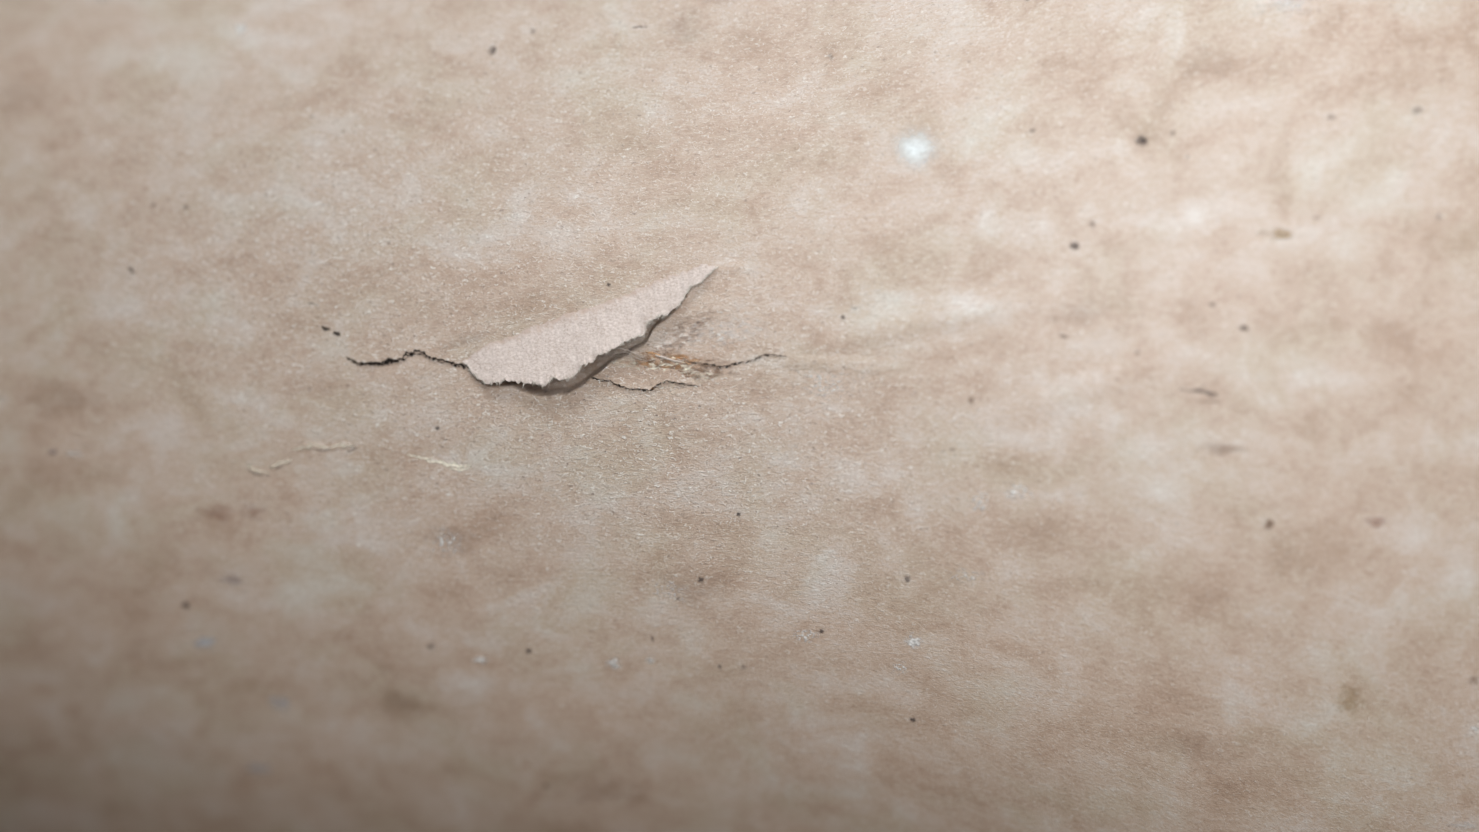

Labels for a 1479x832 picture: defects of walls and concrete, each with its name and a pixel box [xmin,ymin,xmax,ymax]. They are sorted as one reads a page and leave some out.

crack [347,349,466,369]
peeling [592,362,701,390]
crack [592,354,787,391]